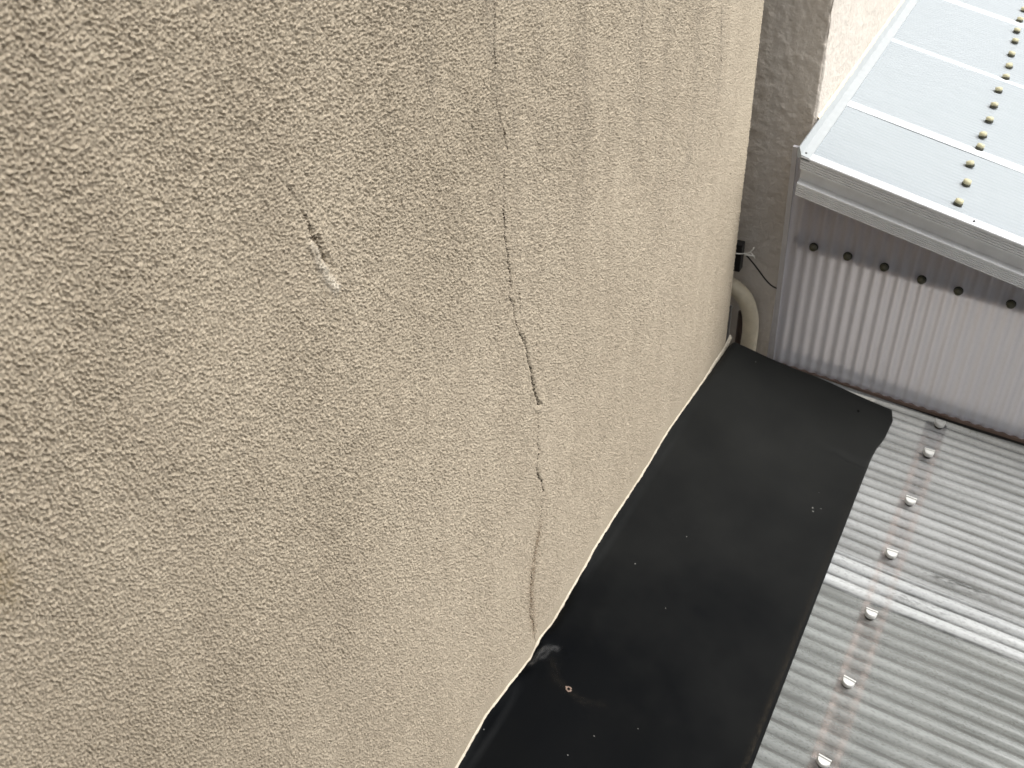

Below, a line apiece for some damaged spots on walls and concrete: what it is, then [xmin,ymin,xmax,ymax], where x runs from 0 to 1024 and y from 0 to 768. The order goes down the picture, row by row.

crack [493,2,544,637]